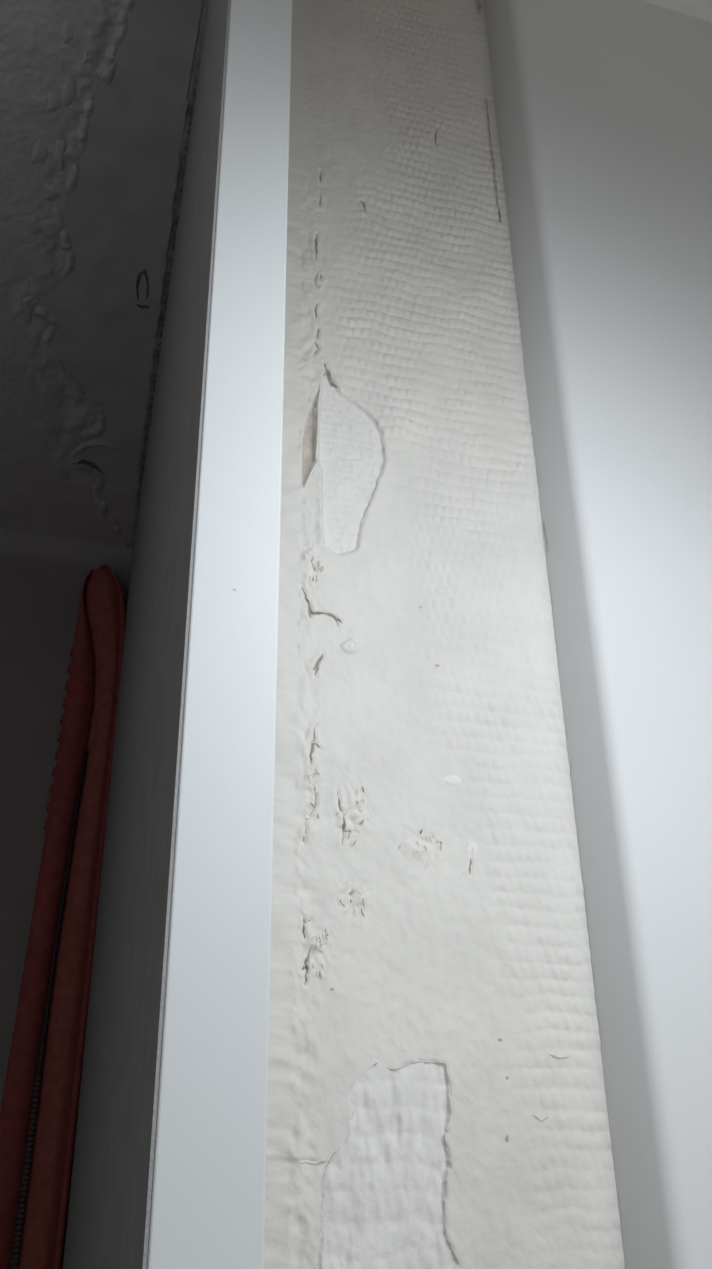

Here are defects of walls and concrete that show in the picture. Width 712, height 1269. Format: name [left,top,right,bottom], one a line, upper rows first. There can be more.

peeling [298,1060,460,1269]